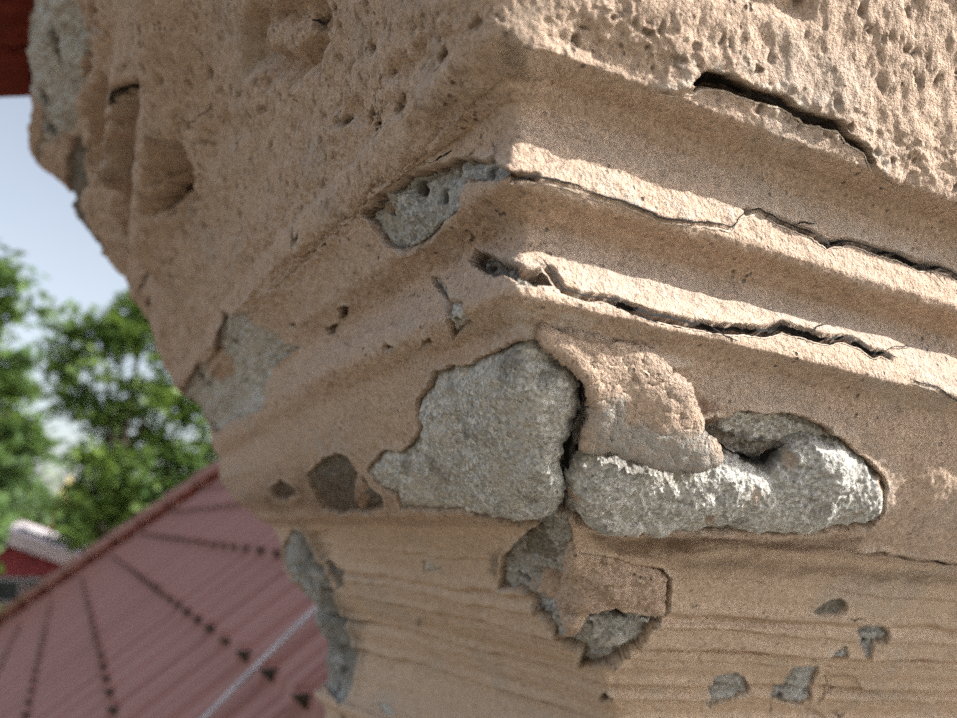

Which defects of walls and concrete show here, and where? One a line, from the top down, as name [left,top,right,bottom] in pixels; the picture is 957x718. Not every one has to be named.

spalling [25,0,104,250]
crack [648,74,902,194]
spalling [375,161,511,248]
crack [512,175,957,286]
spalling [186,312,300,431]
spalling [308,339,886,659]
spalling [285,529,359,704]
spalling [705,672,746,704]
spalling [771,666,816,702]